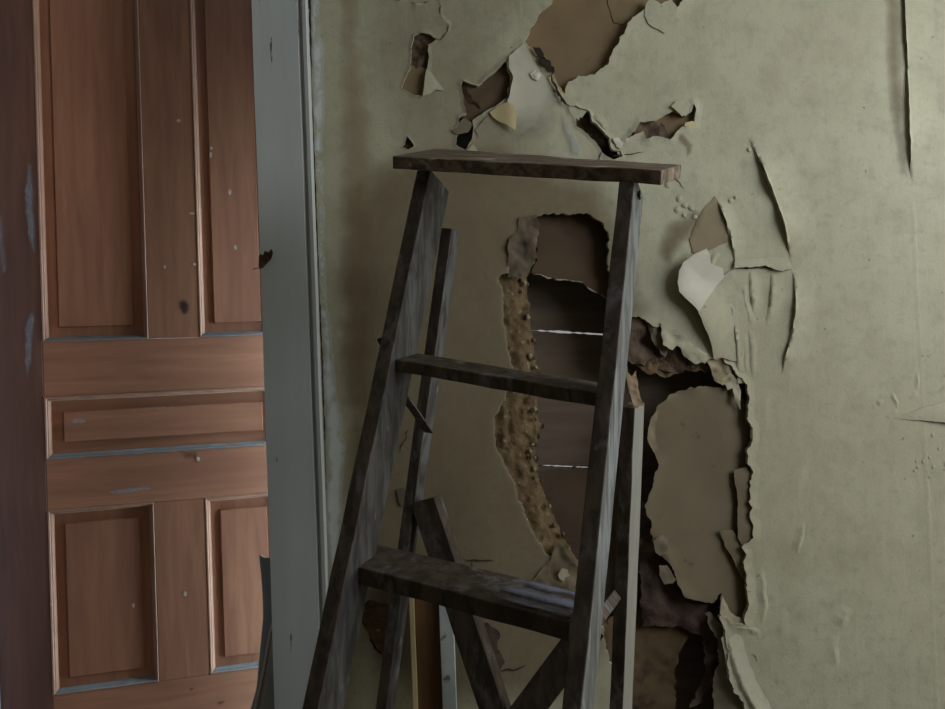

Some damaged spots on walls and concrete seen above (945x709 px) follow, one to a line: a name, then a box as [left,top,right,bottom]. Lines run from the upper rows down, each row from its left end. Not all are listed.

spalling [399,0,452,100]
spalling [399,134,416,152]
spalling [613,96,704,156]
spalling [498,214,609,374]
spalling [627,195,771,709]
spalling [494,391,588,591]
flaking render [362,600,388,655]
flaking render [484,622,526,672]
spalling [602,616,613,662]